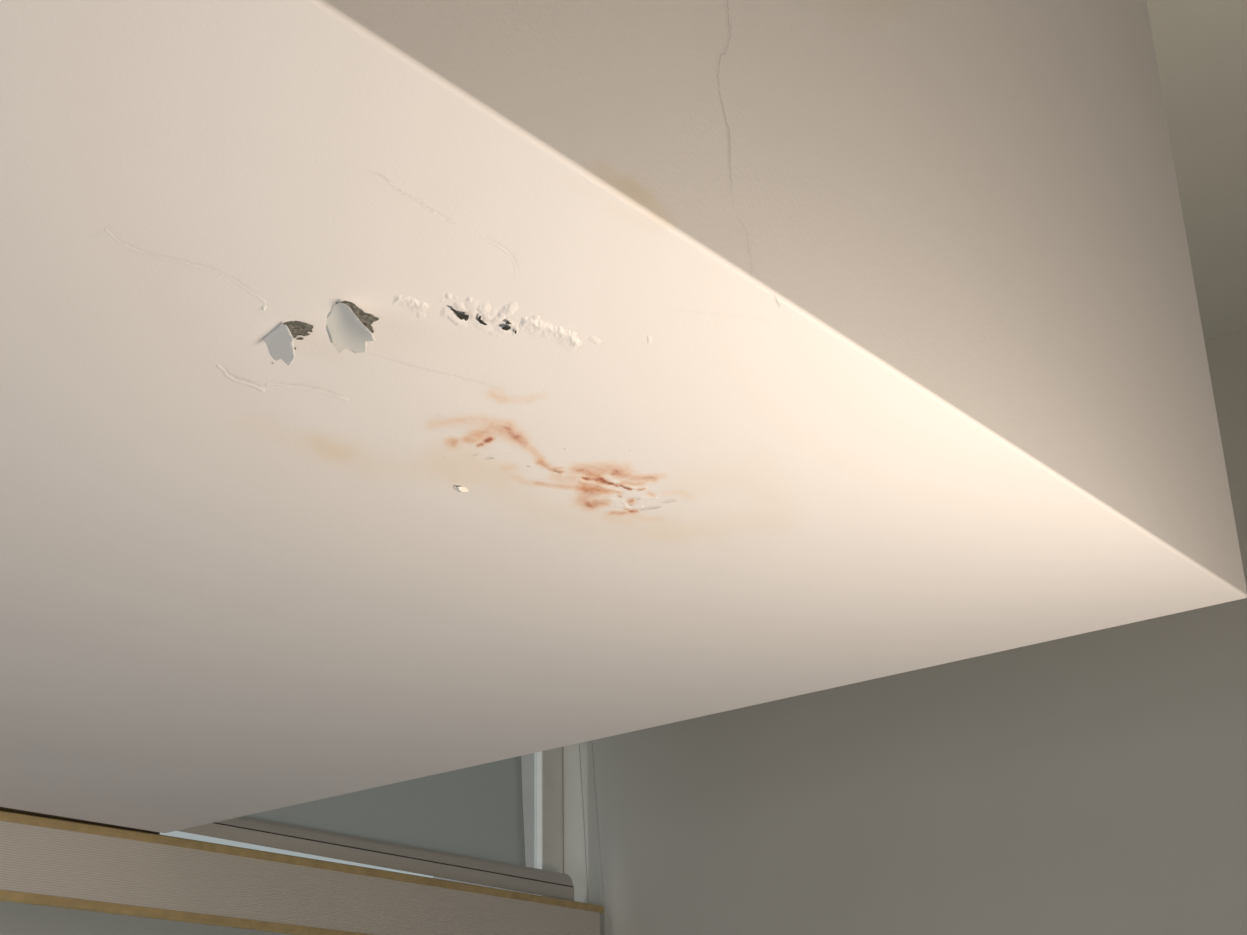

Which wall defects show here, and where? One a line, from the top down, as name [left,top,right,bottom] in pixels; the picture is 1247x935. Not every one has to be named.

peeling [263,301,379,366]
rust [560,474,658,509]